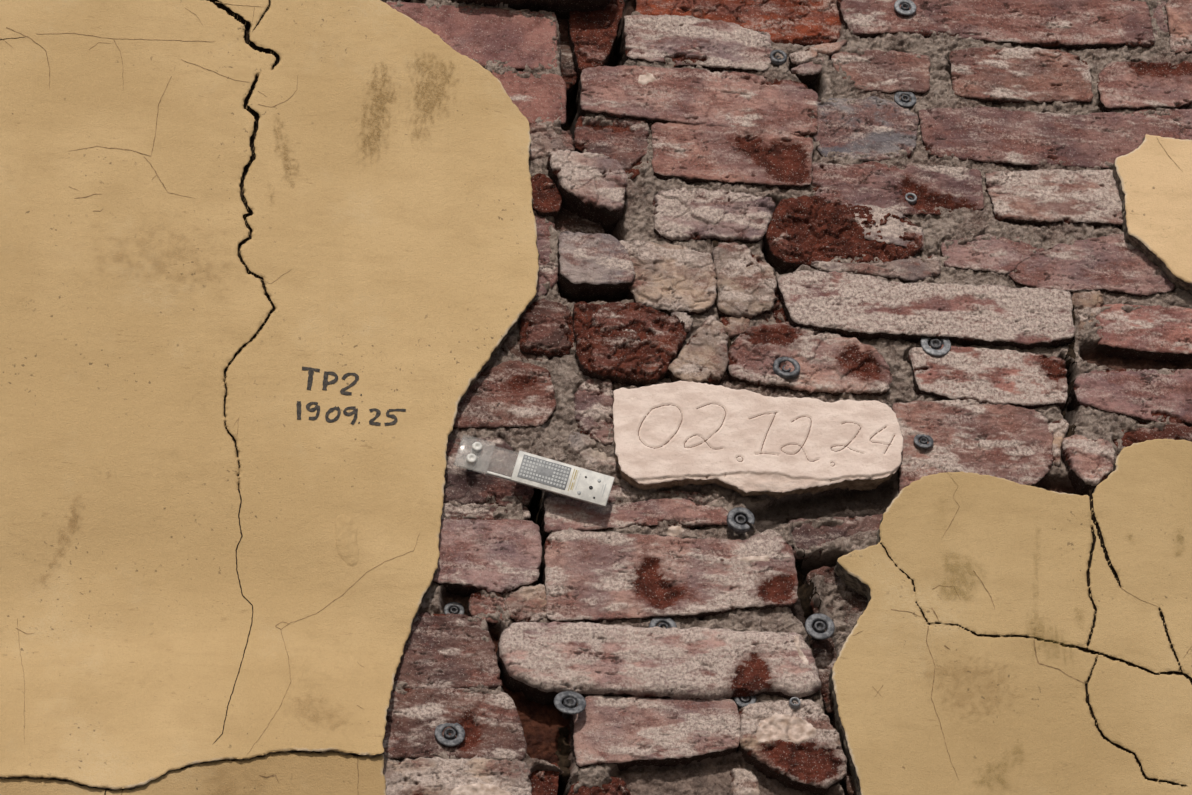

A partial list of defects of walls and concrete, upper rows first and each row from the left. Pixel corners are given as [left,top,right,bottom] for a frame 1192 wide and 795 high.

peeling [788,40,848,89]
crack [0,0,418,790]
crack [13,777,124,795]
crack [880,487,1192,786]